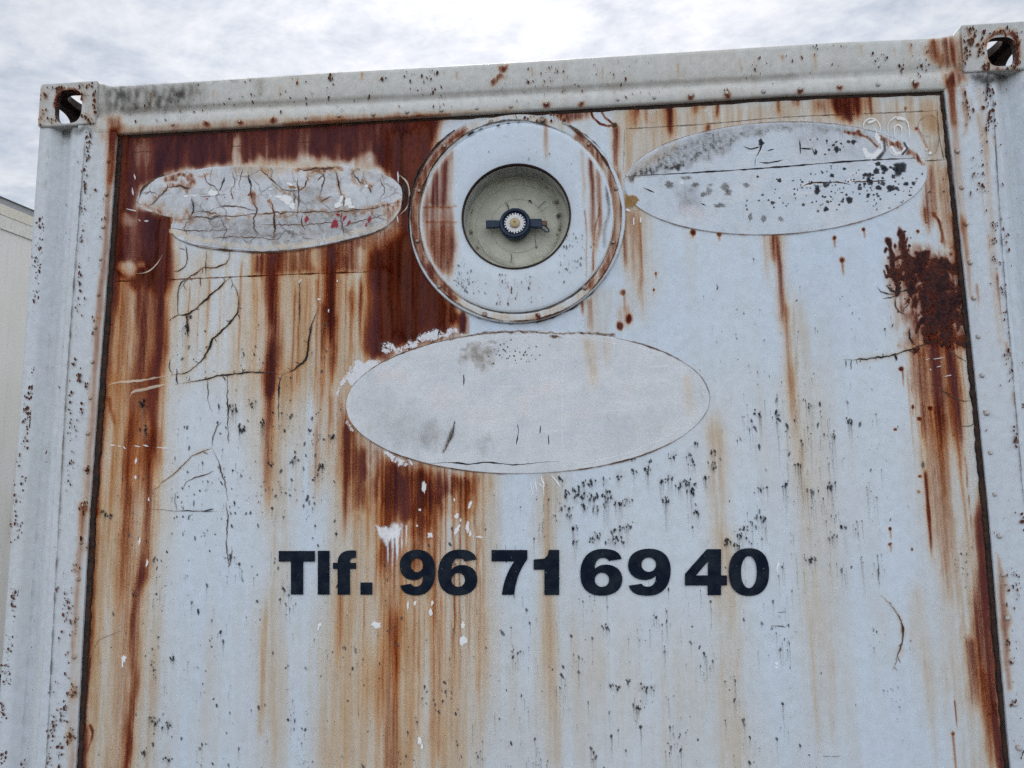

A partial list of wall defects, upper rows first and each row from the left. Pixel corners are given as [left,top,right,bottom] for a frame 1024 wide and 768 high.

rust [541,102,625,288]
rust [824,86,872,122]
crack [151,246,325,564]
rust [82,85,473,768]
crack [846,284,966,365]
rust [883,170,966,444]
rust [918,463,932,546]
crack [877,557,904,670]
rust [968,503,1007,768]